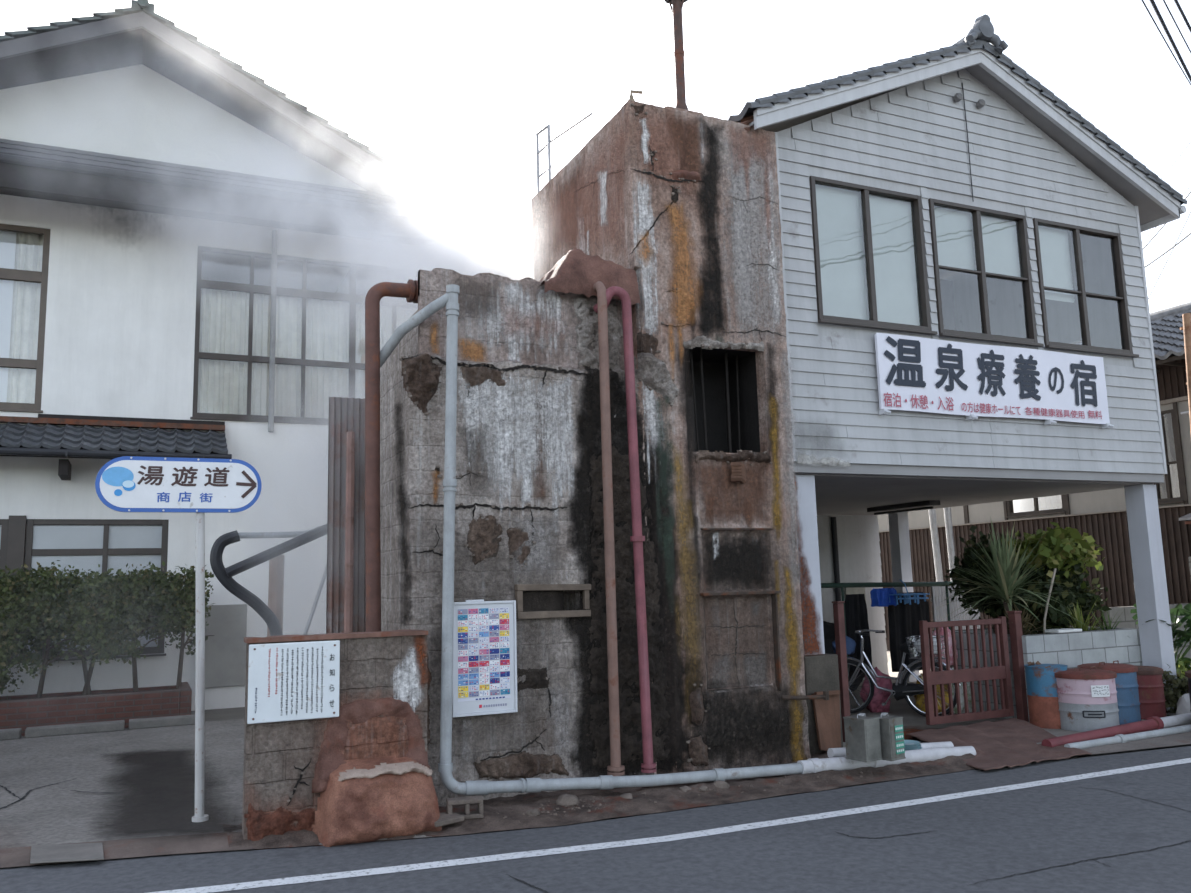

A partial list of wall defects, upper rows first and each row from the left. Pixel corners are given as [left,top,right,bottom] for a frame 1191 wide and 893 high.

crack [573,146,777,255]
spalling [401,353,444,415]
spalling [460,363,506,391]
crack [399,353,593,397]
water stain [460,120,822,778]
crack [408,470,567,556]
spalling [464,514,536,567]
spalling [473,751,569,781]
crack [0,778,120,809]